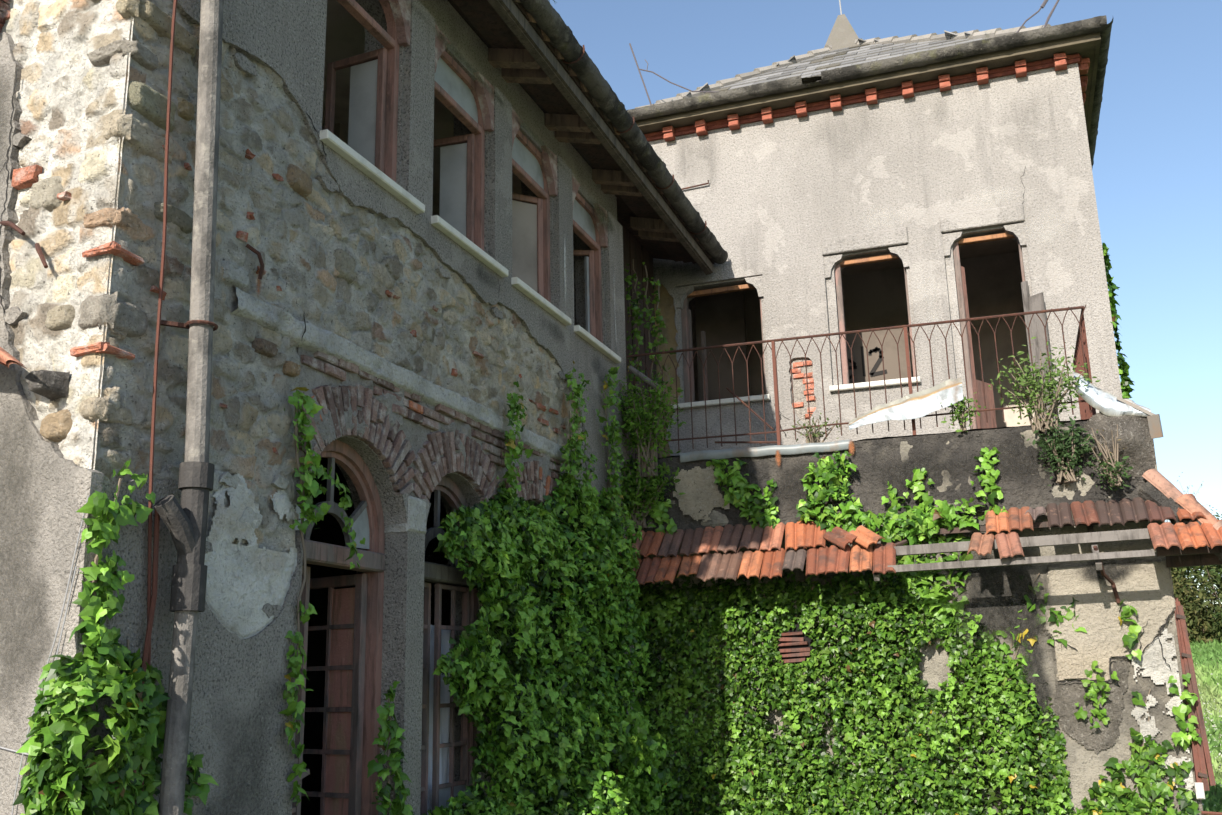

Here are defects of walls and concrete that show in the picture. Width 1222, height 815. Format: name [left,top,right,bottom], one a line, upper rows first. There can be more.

water stain [0,417,44,703]
spalling [1,0,200,481]
spalling [204,41,582,639]
flaking render [654,284,681,458]
flaking render [673,464,730,522]
spalling [789,358,817,426]
flaking render [1045,560,1198,815]